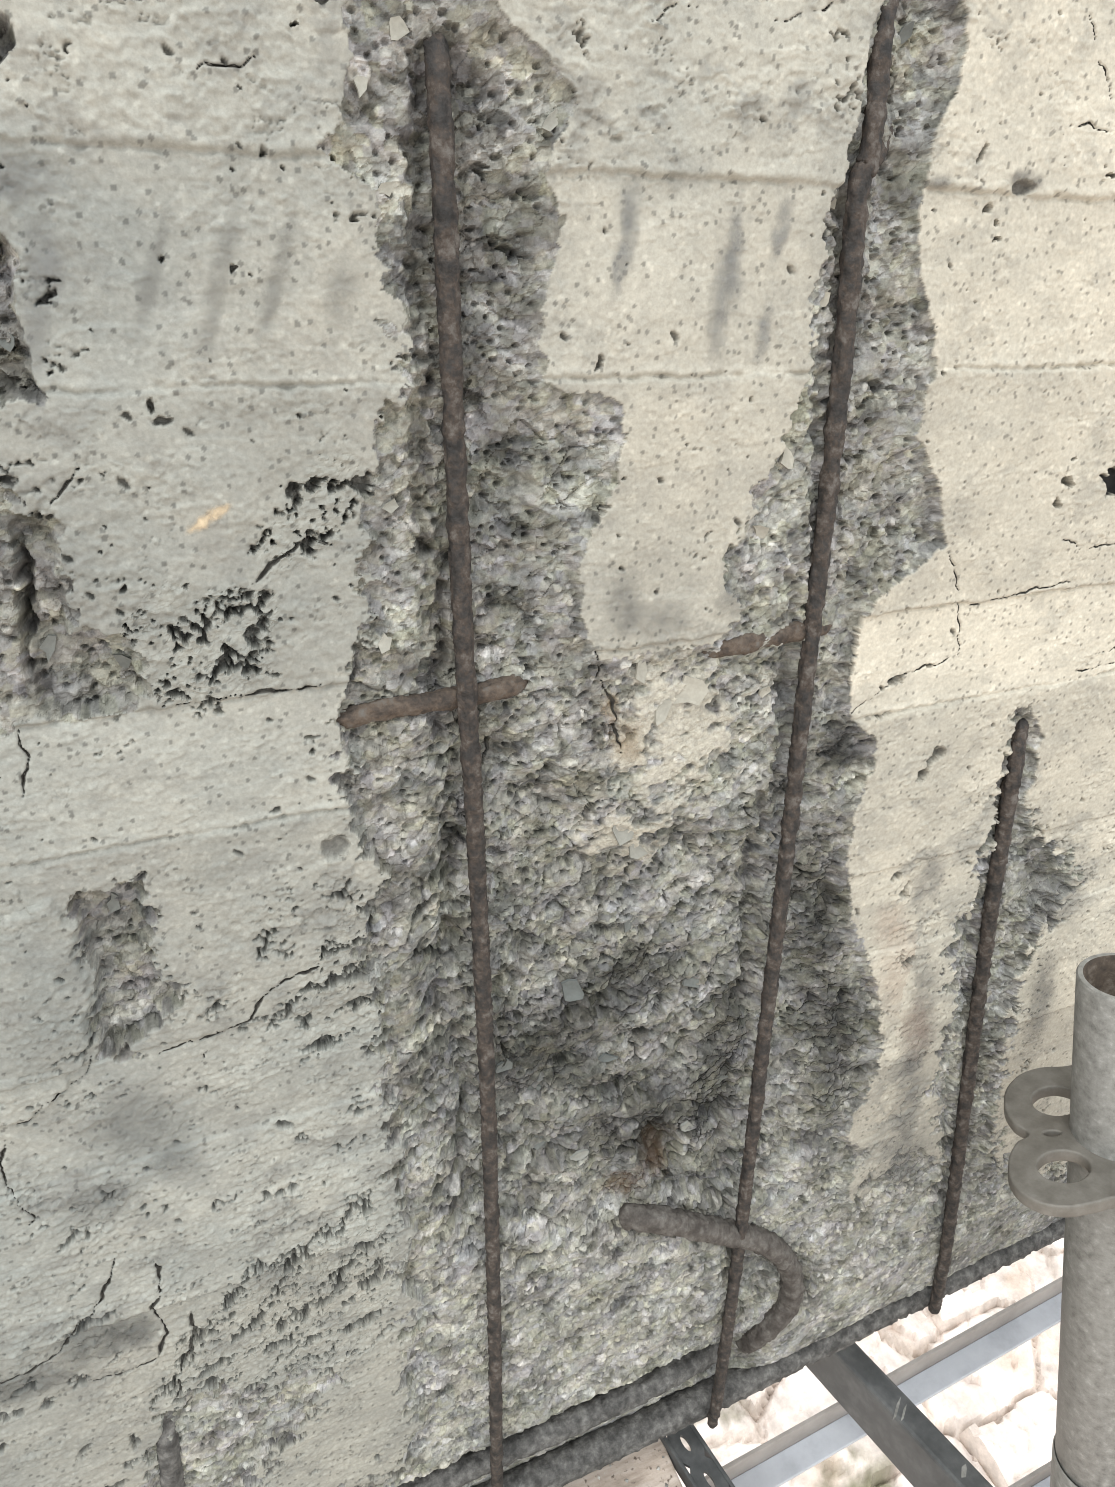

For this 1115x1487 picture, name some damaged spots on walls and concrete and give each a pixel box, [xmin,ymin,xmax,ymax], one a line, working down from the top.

spalling [0,13,16,64]
spalling [0,233,47,408]
spalling [146,396,174,426]
spalling [0,480,161,737]
crack [843,539,1115,716]
spalling [315,0,1088,1487]
spalling [66,871,189,1063]
spalling [275,1119,296,1130]
crack [0,1258,115,1384]
crack [91,1263,194,1394]
spalling [0,1397,57,1423]
spalling [105,1363,350,1487]